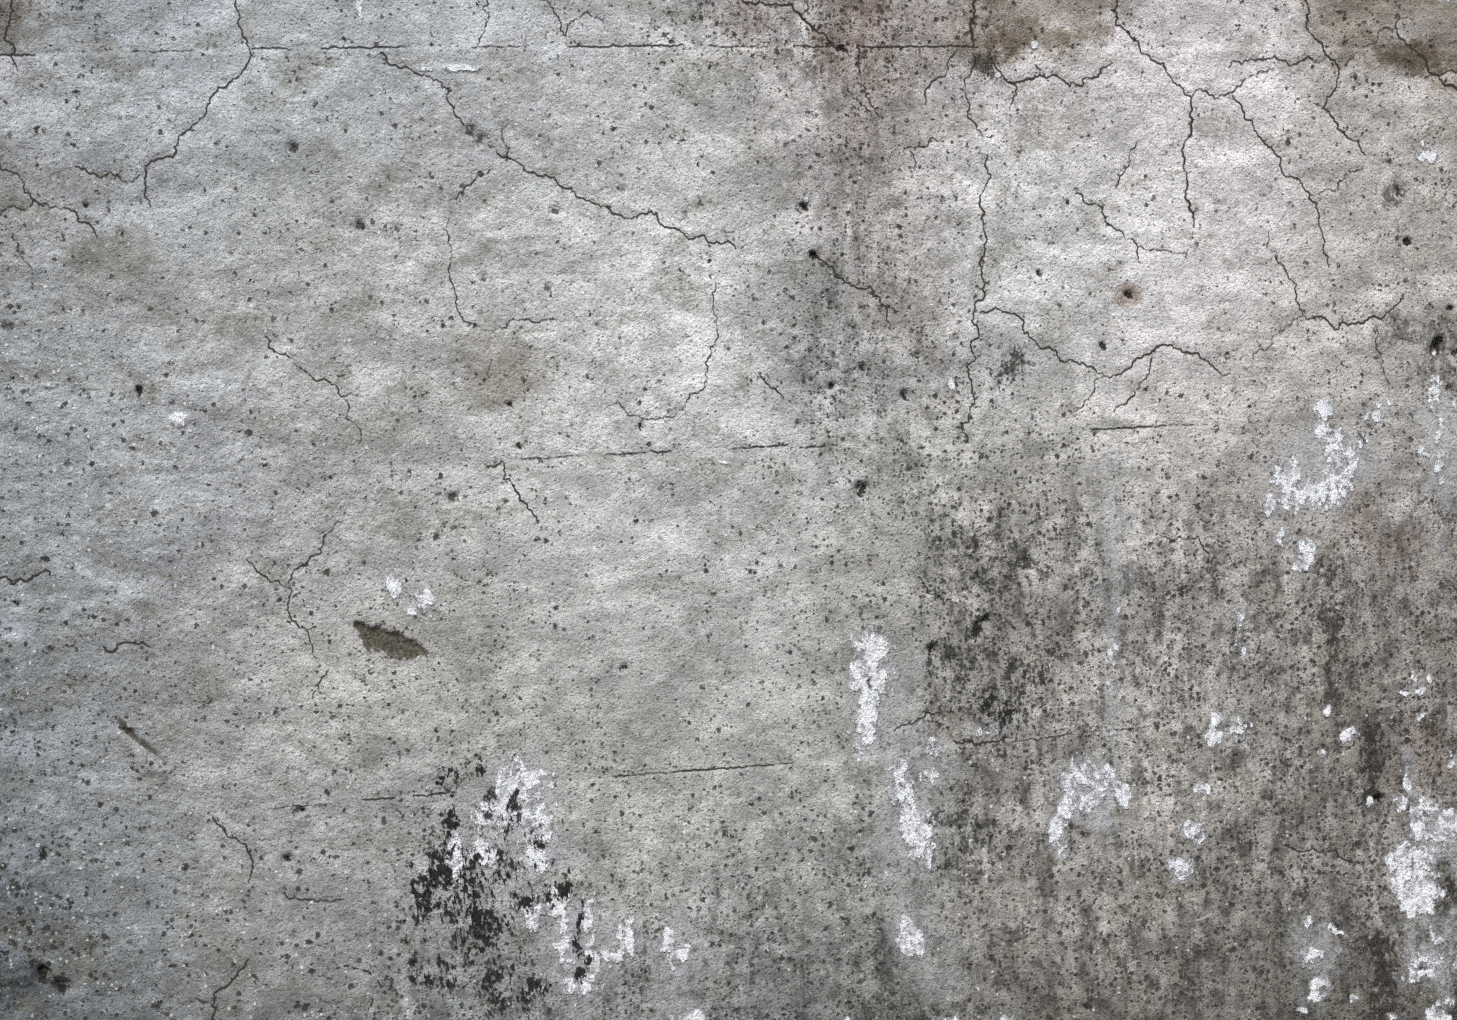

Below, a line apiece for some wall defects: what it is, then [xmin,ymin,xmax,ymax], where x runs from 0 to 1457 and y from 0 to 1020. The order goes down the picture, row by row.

crack [75,0,253,207]
crack [742,0,882,116]
crack [0,165,97,269]
crack [380,52,736,377]
crack [902,0,1457,442]
crack [609,283,719,420]
spalling [349,571,439,660]
leakage [922,624,1054,748]
leakage [1313,556,1345,699]
leakage [1357,721,1385,805]
leakage [400,755,594,1019]
leakage [923,782,999,887]